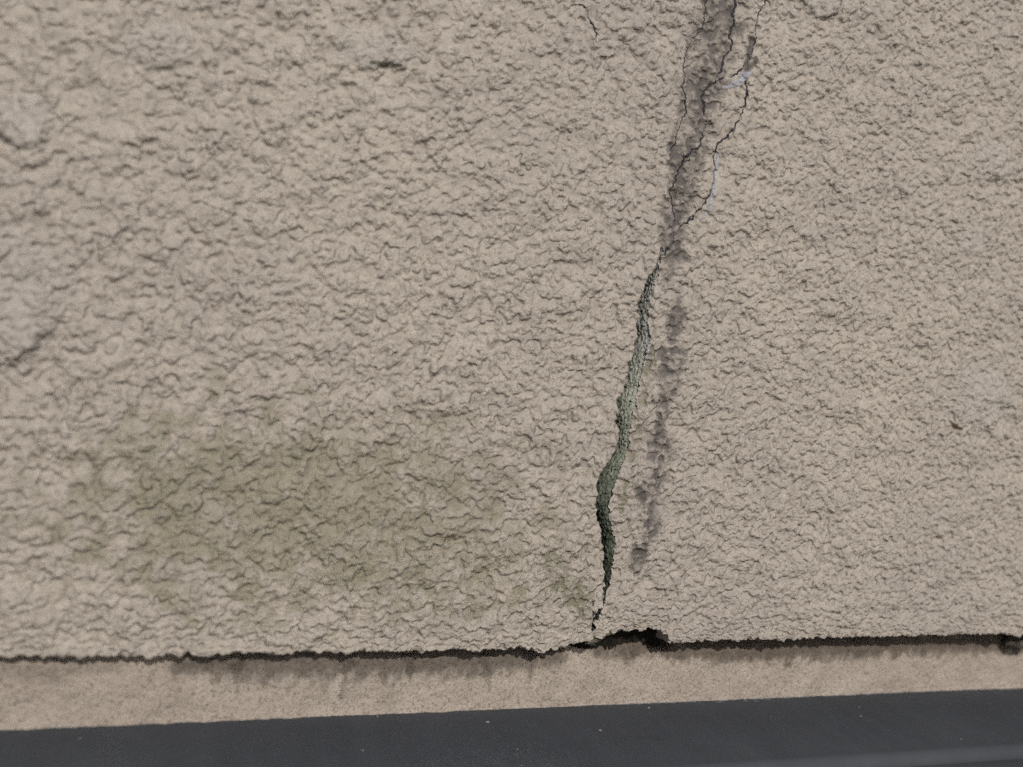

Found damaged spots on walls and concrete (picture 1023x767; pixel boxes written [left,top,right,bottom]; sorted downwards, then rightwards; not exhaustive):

crack [582,0,767,646]